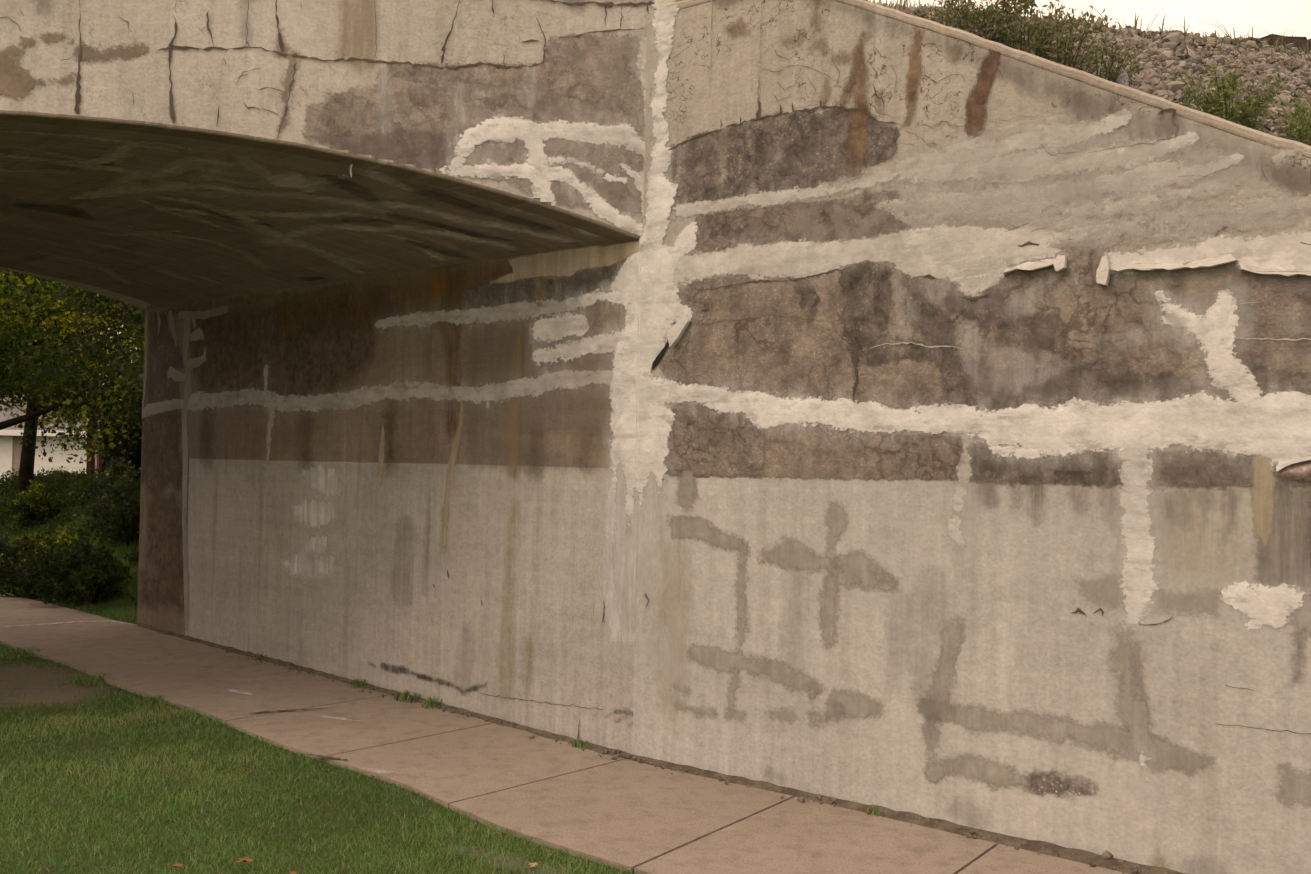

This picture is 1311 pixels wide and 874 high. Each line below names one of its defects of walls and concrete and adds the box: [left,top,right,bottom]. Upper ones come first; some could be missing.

crack [64,0,82,114]
crack [158,0,654,138]
crack [668,0,965,152]
corrosion [828,32,868,178]
corrosion [904,31,922,125]
corrosion [965,50,1000,138]
spalling [652,107,1311,413]
spalling [665,403,1124,481]
damp [970,444,1125,488]
spalling [1272,455,1311,488]
damp [669,470,898,727]
damp [918,617,1213,787]